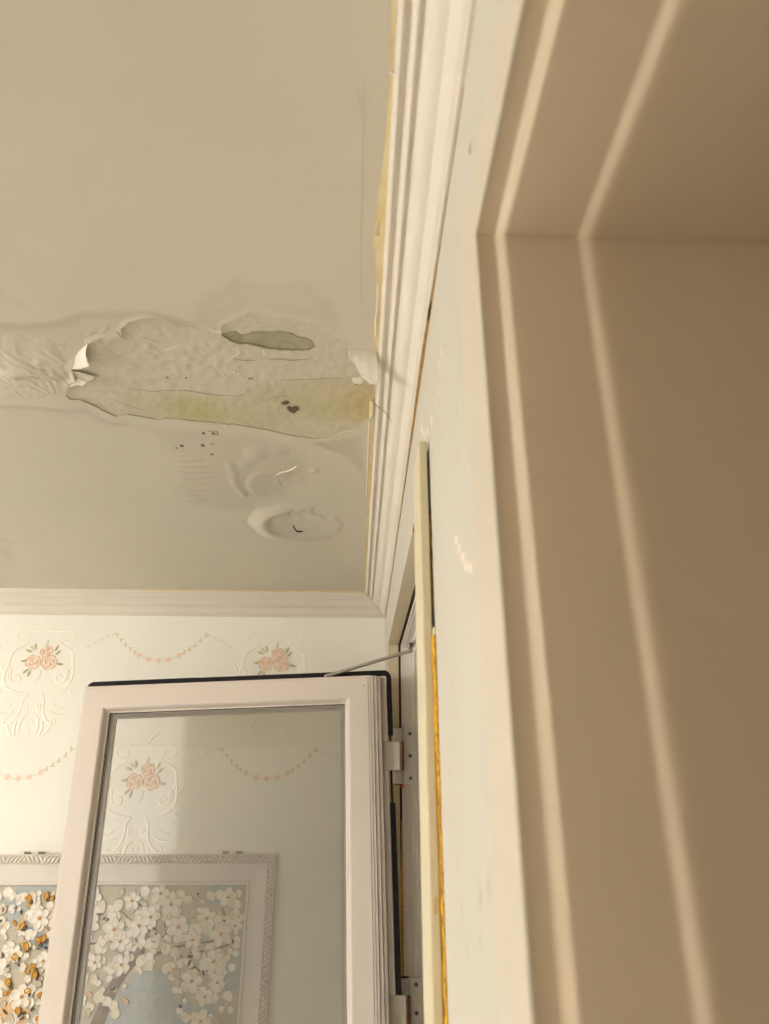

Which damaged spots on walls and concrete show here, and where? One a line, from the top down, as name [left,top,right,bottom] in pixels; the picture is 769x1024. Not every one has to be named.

peeling [66,308,380,441]